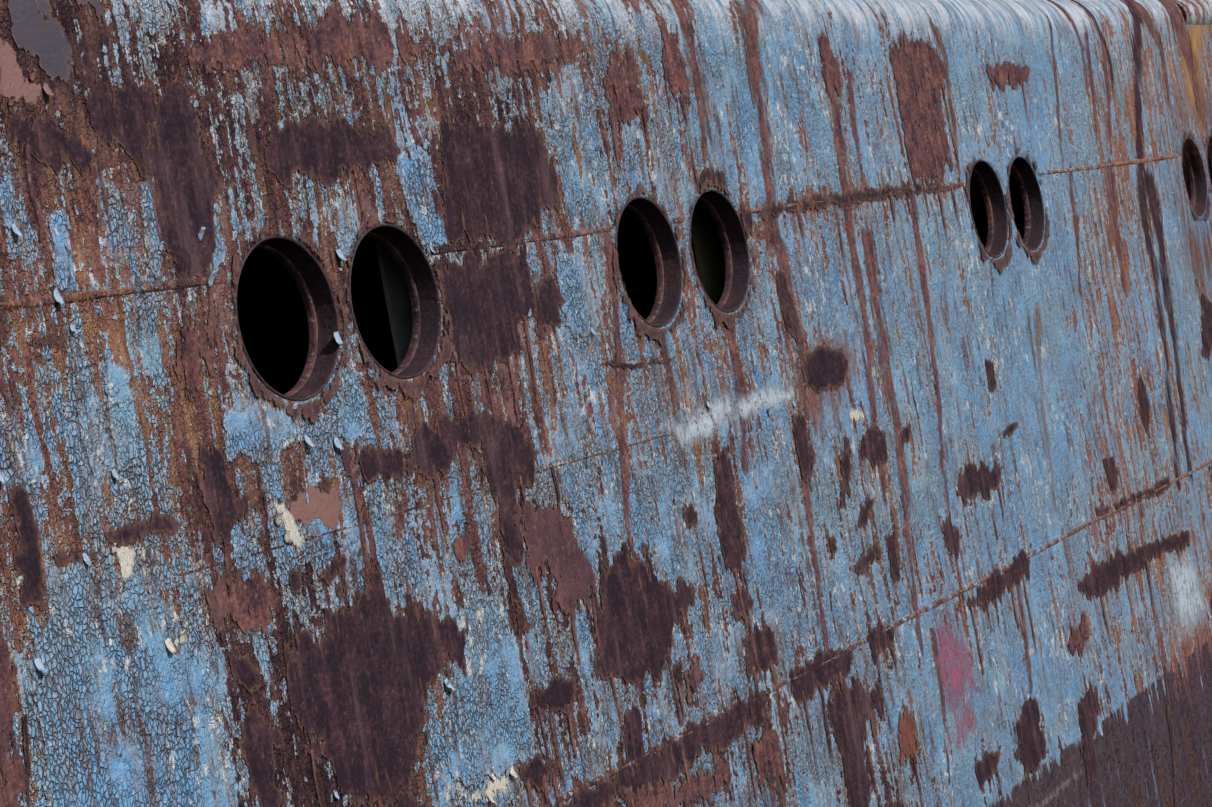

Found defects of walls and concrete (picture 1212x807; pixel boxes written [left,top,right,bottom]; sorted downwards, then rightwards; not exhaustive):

corrosion [0,0,593,416]
corrosion [1096,0,1212,516]
corrosion [284,0,1047,807]
corrosion [0,618,27,807]
corrosion [0,480,97,612]
peeling [28,543,239,807]
corrosion [105,509,186,548]
corrosion [187,442,302,638]
corrosion [235,704,288,807]
corrosion [1079,680,1100,786]
corrosion [1066,529,1190,655]